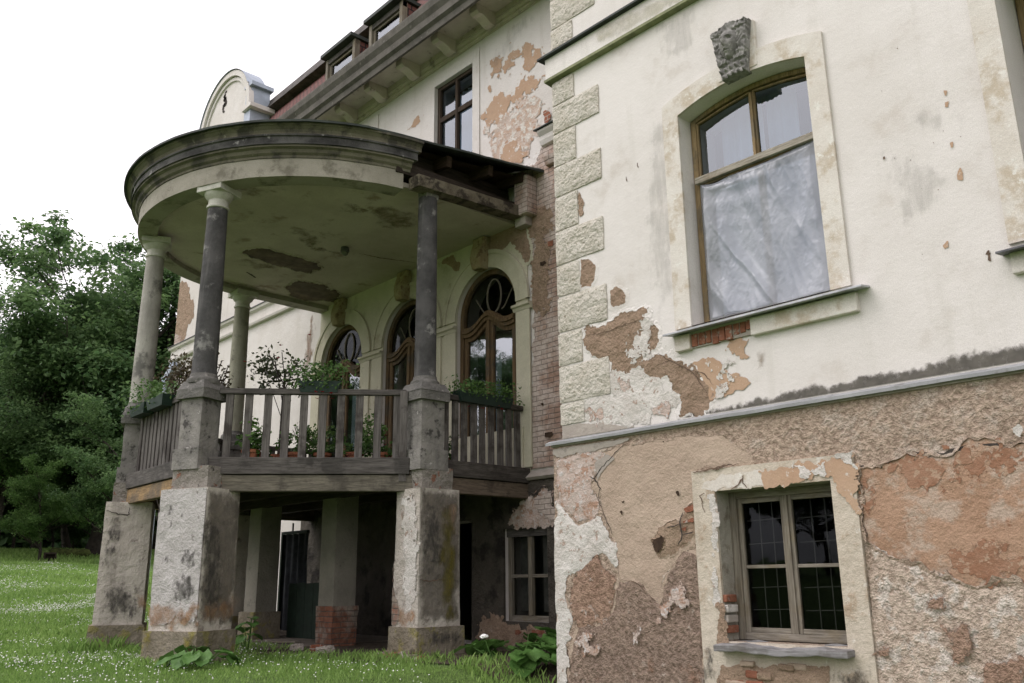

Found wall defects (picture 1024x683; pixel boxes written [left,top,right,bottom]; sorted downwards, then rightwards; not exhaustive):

peeling [174,281,194,345]
spalling [475,42,1024,679]
leakage [686,346,1024,418]
crack [591,445,623,535]
leakage [106,590,136,618]
leakage [175,493,240,627]